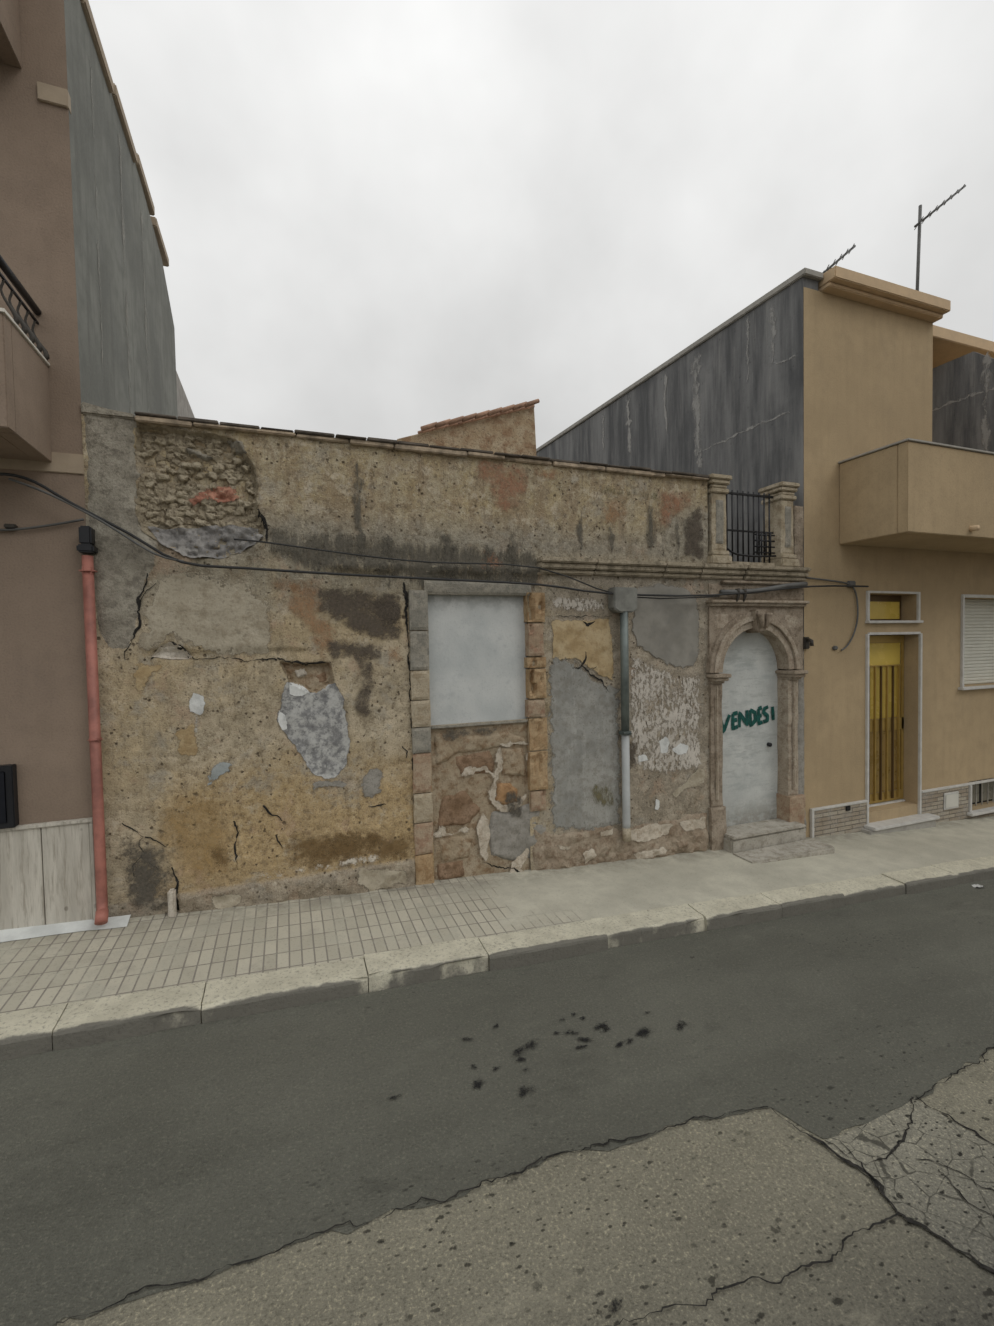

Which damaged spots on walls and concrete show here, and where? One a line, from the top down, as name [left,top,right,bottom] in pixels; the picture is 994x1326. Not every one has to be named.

spalling [134,425,264,559]
crack [124,573,331,666]
peeling [138,573,350,779]
water stain [270,463,540,716]
peeling [551,595,614,680]
spalling [509,656,709,873]
water stain [123,843,170,910]
water stain [291,833,409,872]
peeling [476,813,490,861]